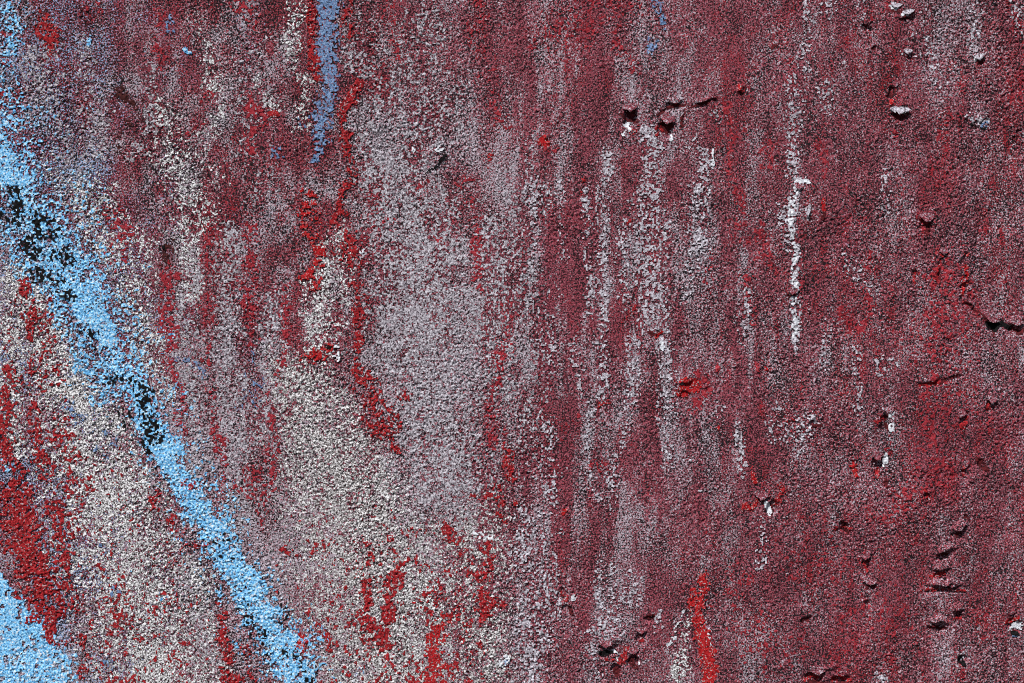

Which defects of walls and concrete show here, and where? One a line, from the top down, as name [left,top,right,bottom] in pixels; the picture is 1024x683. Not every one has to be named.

spalling [619,103,676,143]
crack [964,301,1024,338]
spalling [598,614,655,677]